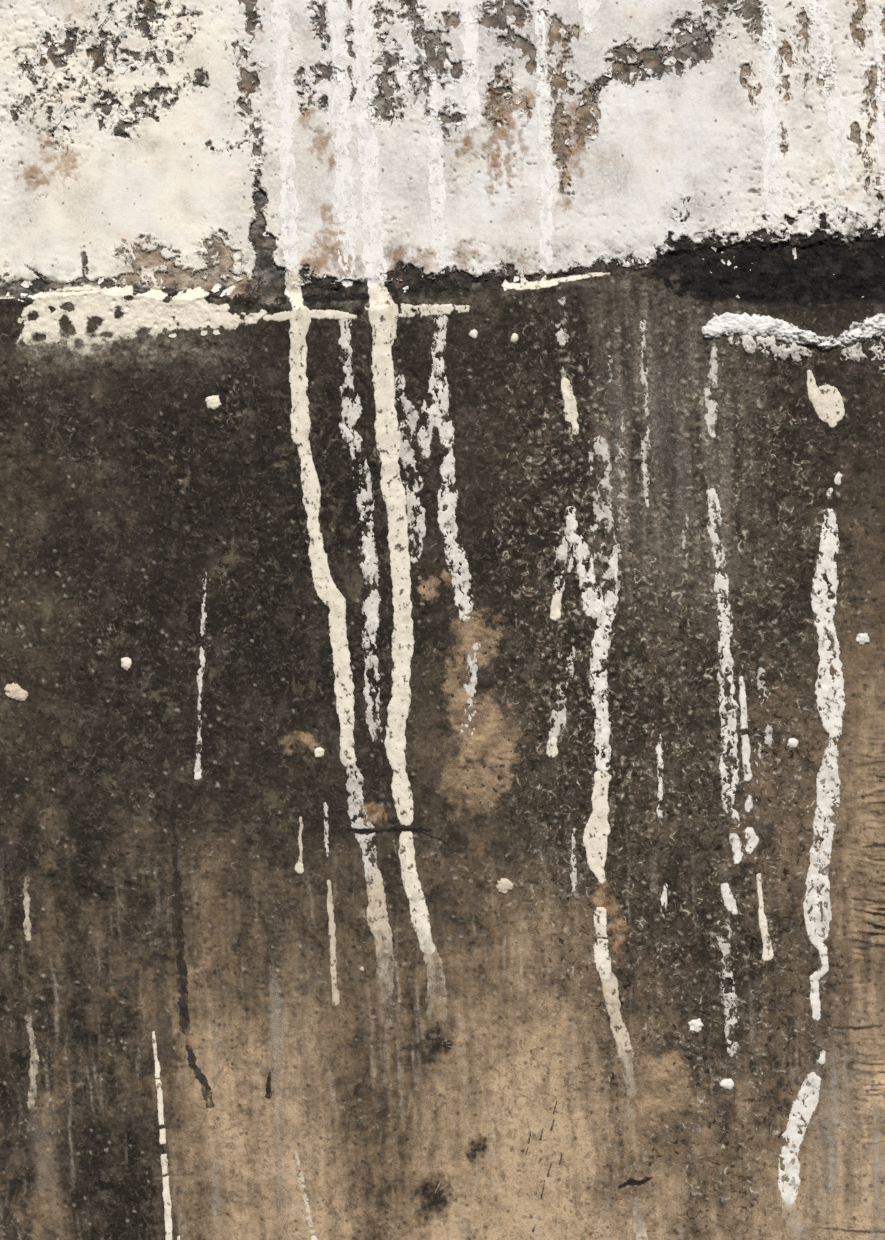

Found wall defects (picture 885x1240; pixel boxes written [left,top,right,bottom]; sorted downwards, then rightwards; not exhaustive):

peeling [0,0,362,356]
peeling [294,0,835,195]
flaking render [380,55,885,295]
peeling [850,0,885,50]
water stain [114,293,142,319]